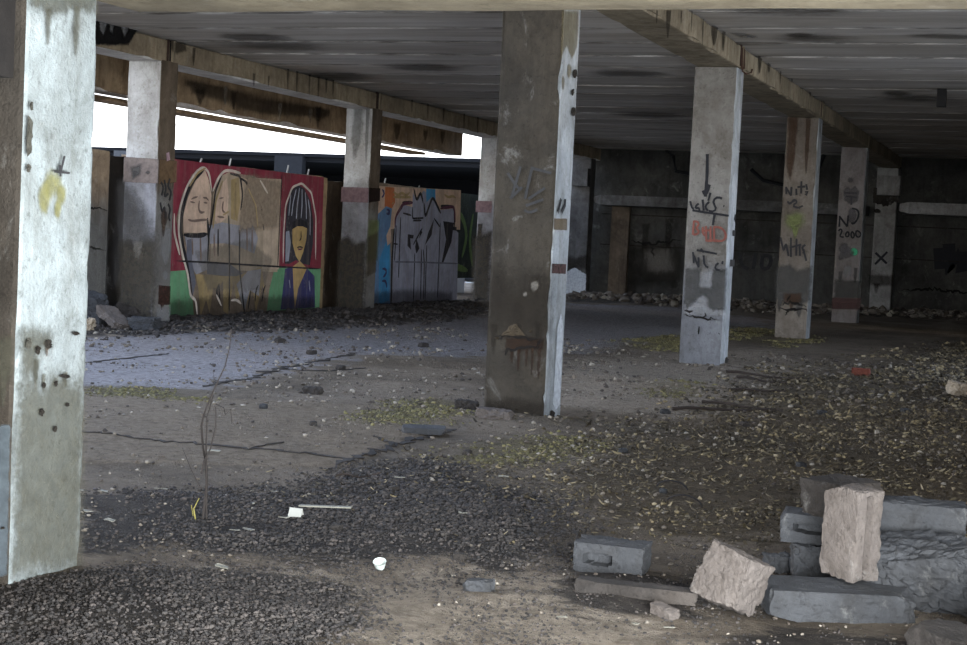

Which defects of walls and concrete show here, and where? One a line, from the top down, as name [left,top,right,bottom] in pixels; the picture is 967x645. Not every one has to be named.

leakage [187,74,330,126]
spalling [26,338,52,355]